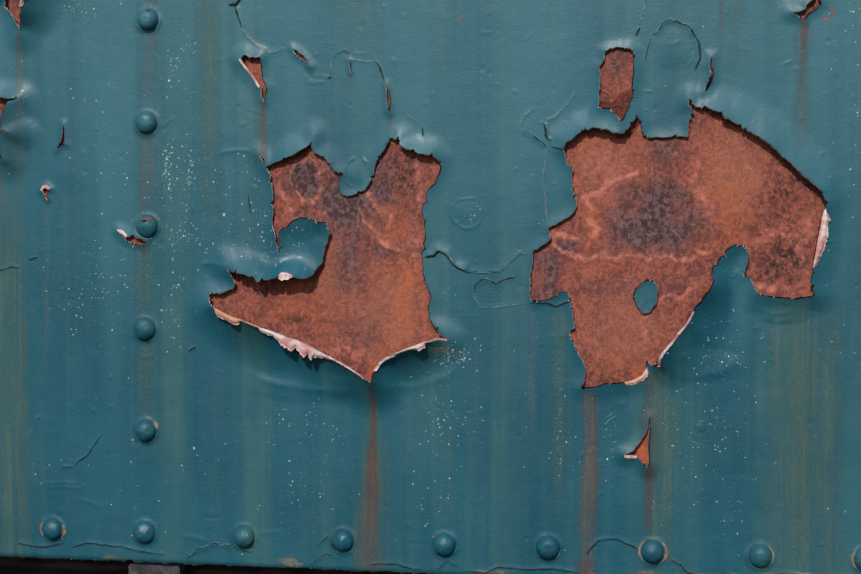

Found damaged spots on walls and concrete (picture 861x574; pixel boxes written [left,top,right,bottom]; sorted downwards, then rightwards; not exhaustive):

peeling [0,0,75,59]
peeling [227,41,277,111]
crack [228,0,290,53]
crack [311,50,384,80]
crack [636,0,701,70]
peeling [776,0,833,29]
peeling [0,78,73,186]
peeling [186,79,469,419]
peeling [523,36,852,404]
peeling [611,409,663,481]